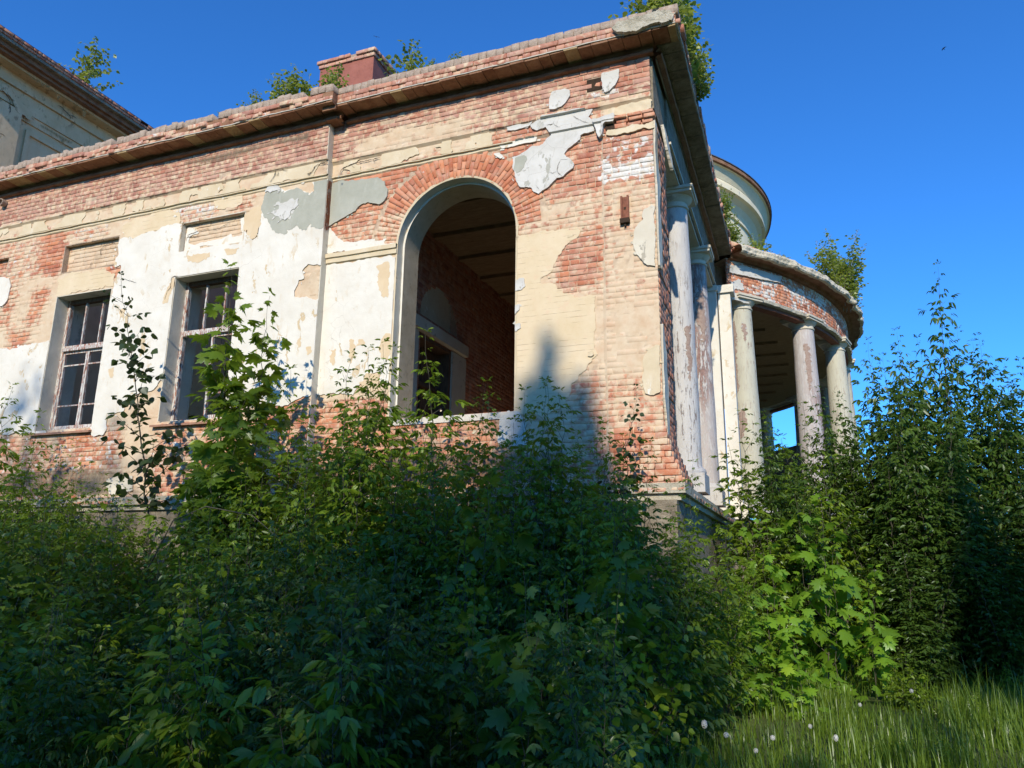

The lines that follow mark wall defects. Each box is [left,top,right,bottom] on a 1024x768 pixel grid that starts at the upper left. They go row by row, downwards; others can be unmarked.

flaking render [243,175,390,242]
spalling [494,69,620,300]
spalling [0,224,124,350]
peeling [187,252,210,263]
spalling [71,398,176,495]
peeling [640,324,670,435]
peeling [684,291,707,381]
peeling [733,321,748,393]
peeling [738,408,748,439]
peeling [803,344,813,390]